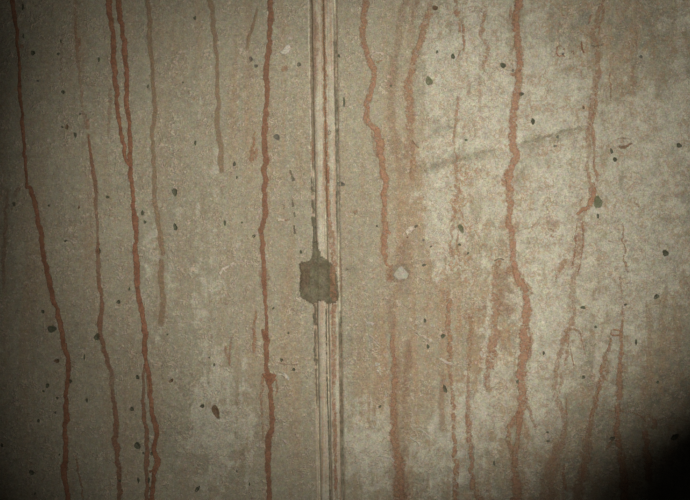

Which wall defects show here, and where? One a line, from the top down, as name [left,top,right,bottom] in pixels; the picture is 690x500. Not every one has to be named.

corrosion [10,0,81,500]
corrosion [88,135,97,193]
corrosion [97,278,110,368]
corrosion [106,0,161,500]
corrosion [147,3,166,321]
corrosion [250,0,278,500]
damp [300,241,339,304]
corrosion [360,1,394,280]
corrosion [390,335,405,497]
corrosion [404,13,431,124]
corrosion [502,0,533,500]
corrosion [576,160,598,215]